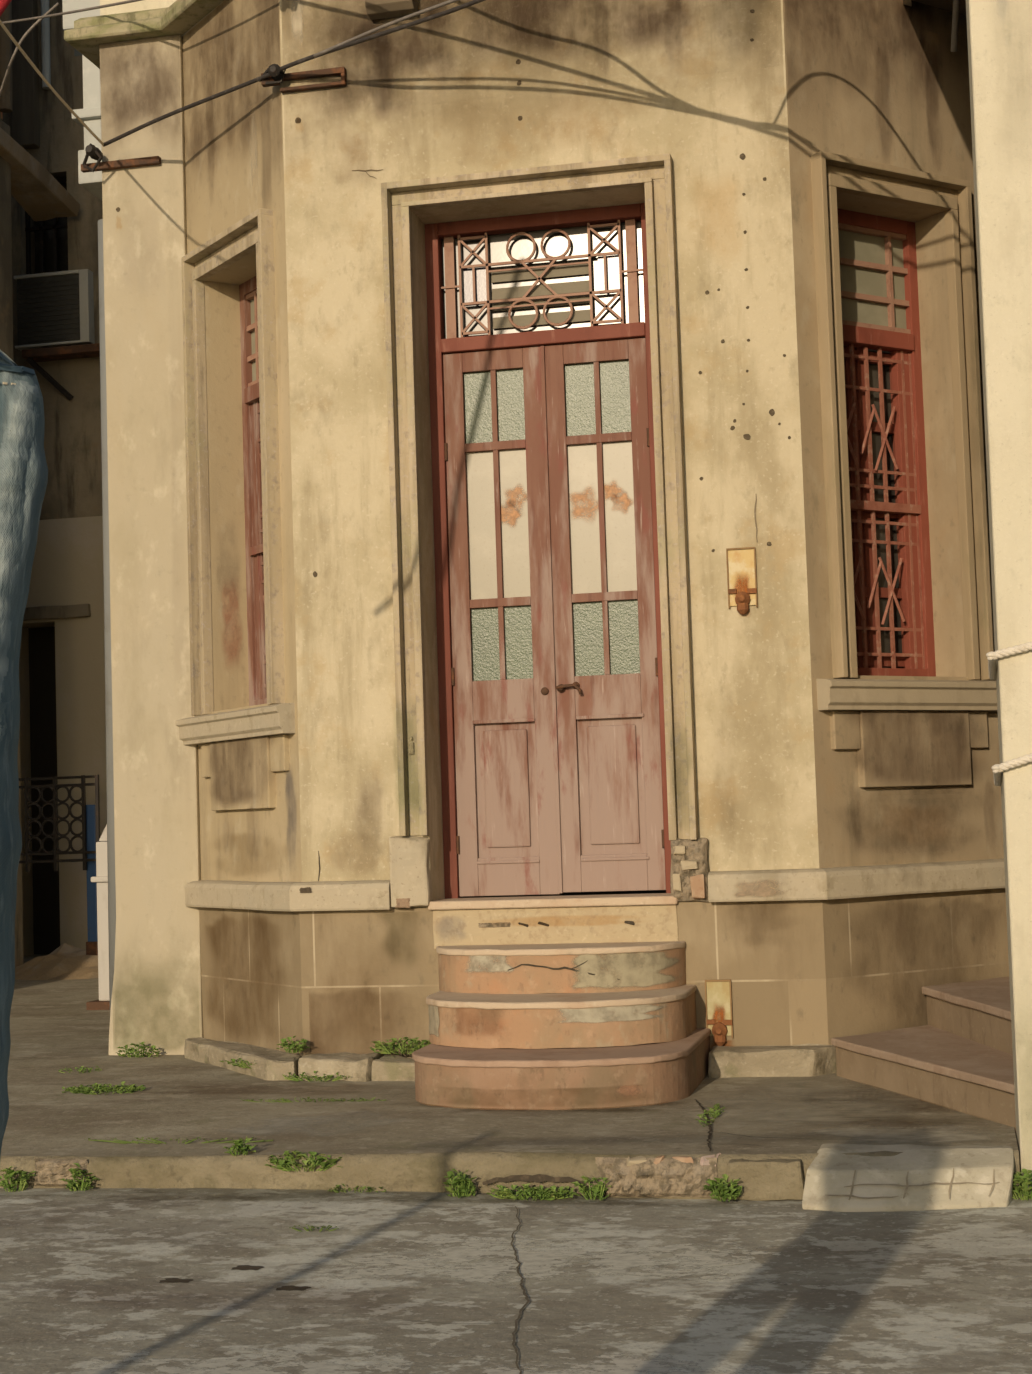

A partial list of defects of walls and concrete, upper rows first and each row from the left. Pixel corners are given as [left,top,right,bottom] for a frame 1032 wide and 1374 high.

leakage [293,9,302,32]
spalling [671,840,708,901]
crack [508,960,620,980]
crack [694,1099,803,1151]
spalling [595,1153,721,1197]
crack [825,1139,1000,1200]
crack [399,1174,584,1374]